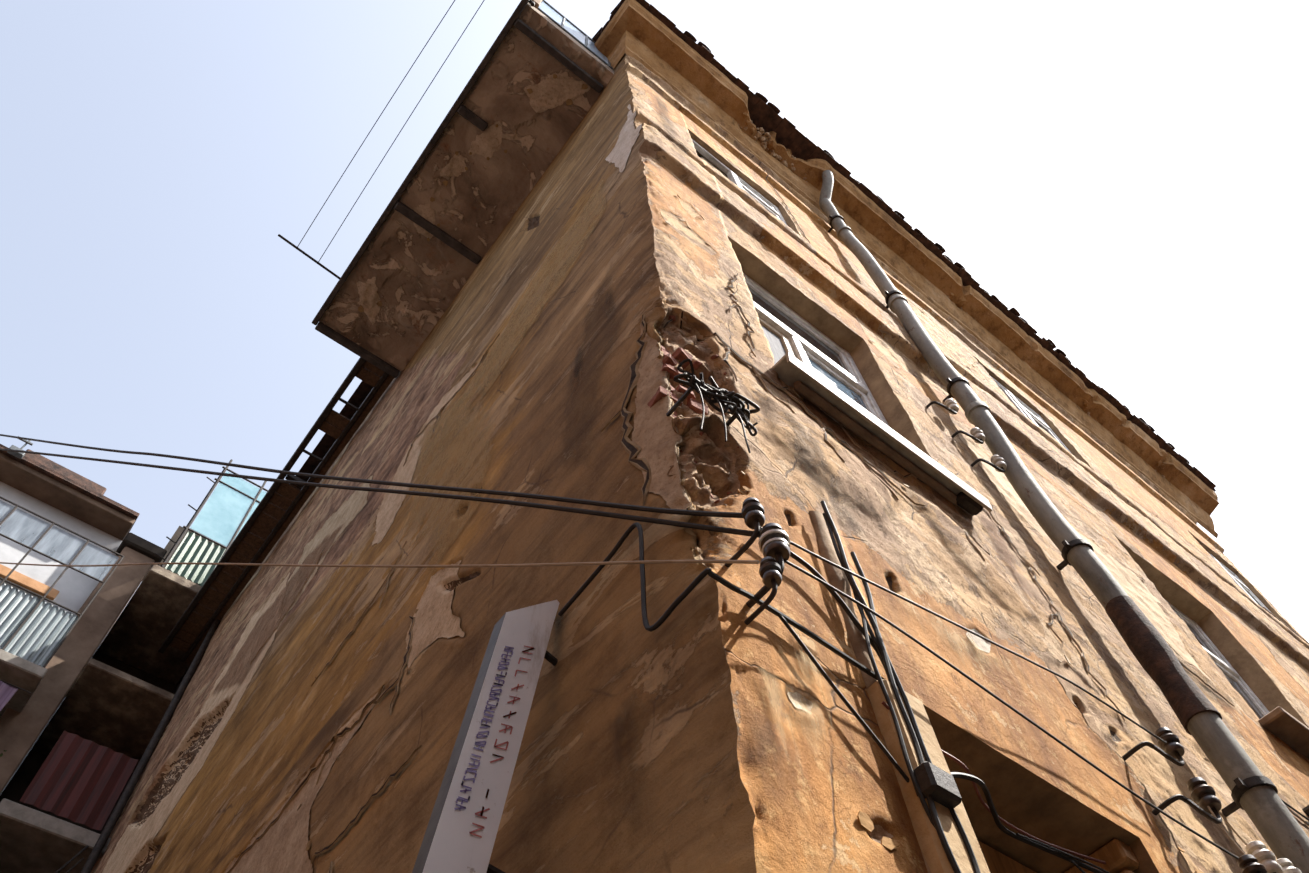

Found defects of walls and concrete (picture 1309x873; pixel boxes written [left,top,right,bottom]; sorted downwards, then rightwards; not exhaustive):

peeling [605,104,642,172]
peeling [632,314,750,510]
crack [601,273,1125,721]
peeling [102,355,487,873]
peeling [966,629,991,653]